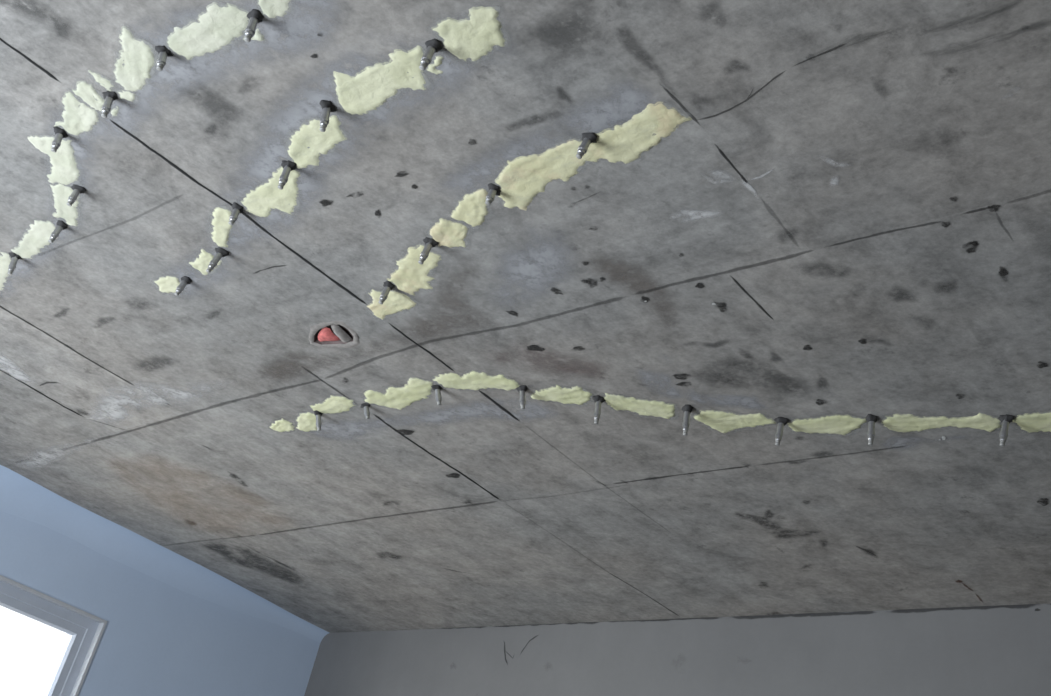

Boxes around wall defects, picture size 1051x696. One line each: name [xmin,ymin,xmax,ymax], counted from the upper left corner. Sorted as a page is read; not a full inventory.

crack [0,0,292,291]
crack [152,6,507,294]
crack [367,44,844,320]
crack [270,370,1051,436]